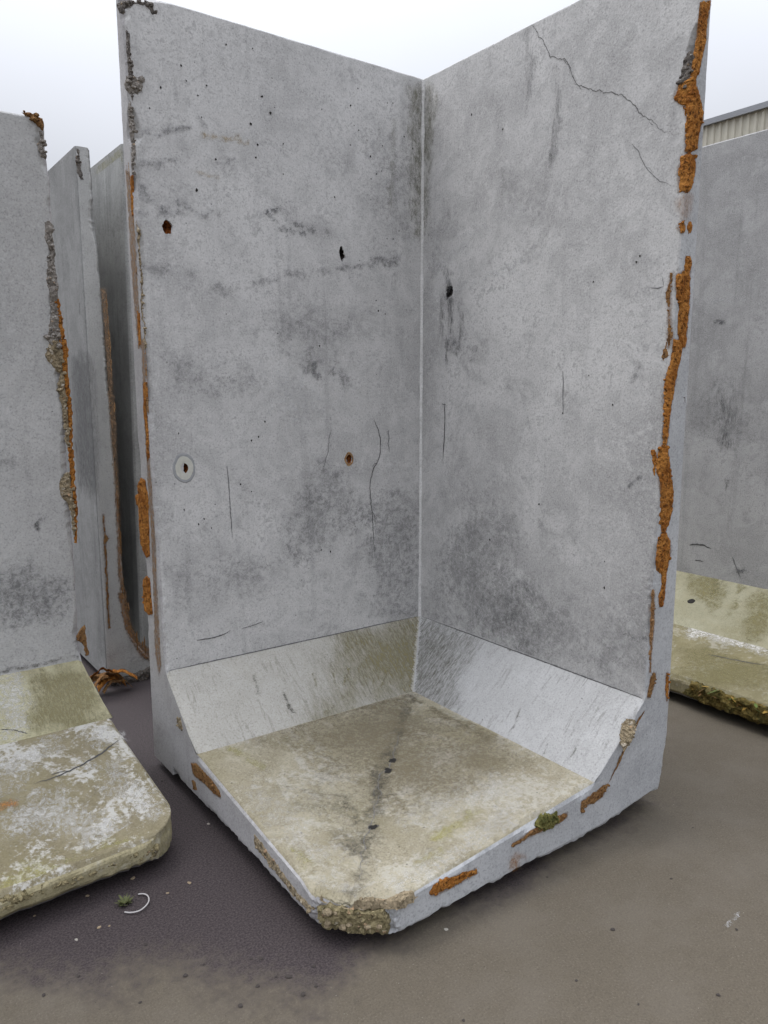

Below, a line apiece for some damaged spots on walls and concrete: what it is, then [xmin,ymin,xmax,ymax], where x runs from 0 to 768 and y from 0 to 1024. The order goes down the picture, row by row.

crack [533,26,681,135]
rust [674,1,711,193]
rust [54,299,78,543]
rust [101,162,161,673]
crack [370,422,389,558]
rust [647,256,692,701]
crack [37,741,117,783]
damp [282,617,517,812]
spalling [619,719,637,751]
spalling [254,834,418,935]
rust [429,869,477,896]
rust [511,811,567,867]